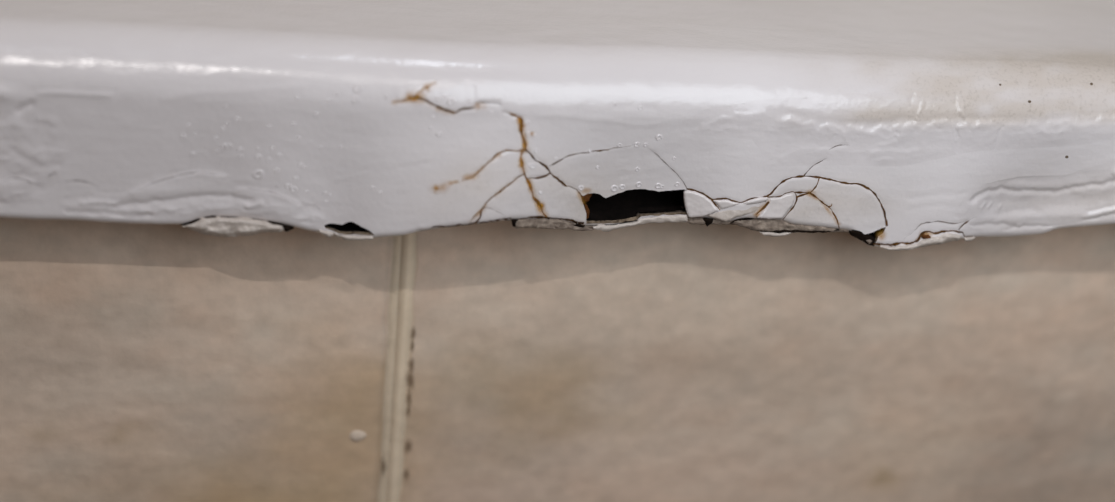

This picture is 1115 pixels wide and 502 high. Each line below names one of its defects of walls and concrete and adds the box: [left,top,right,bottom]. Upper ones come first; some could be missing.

crack [399,97,973,247]
peeling [181,216,294,237]
spalling [318,222,374,240]
spalling [417,189,975,251]